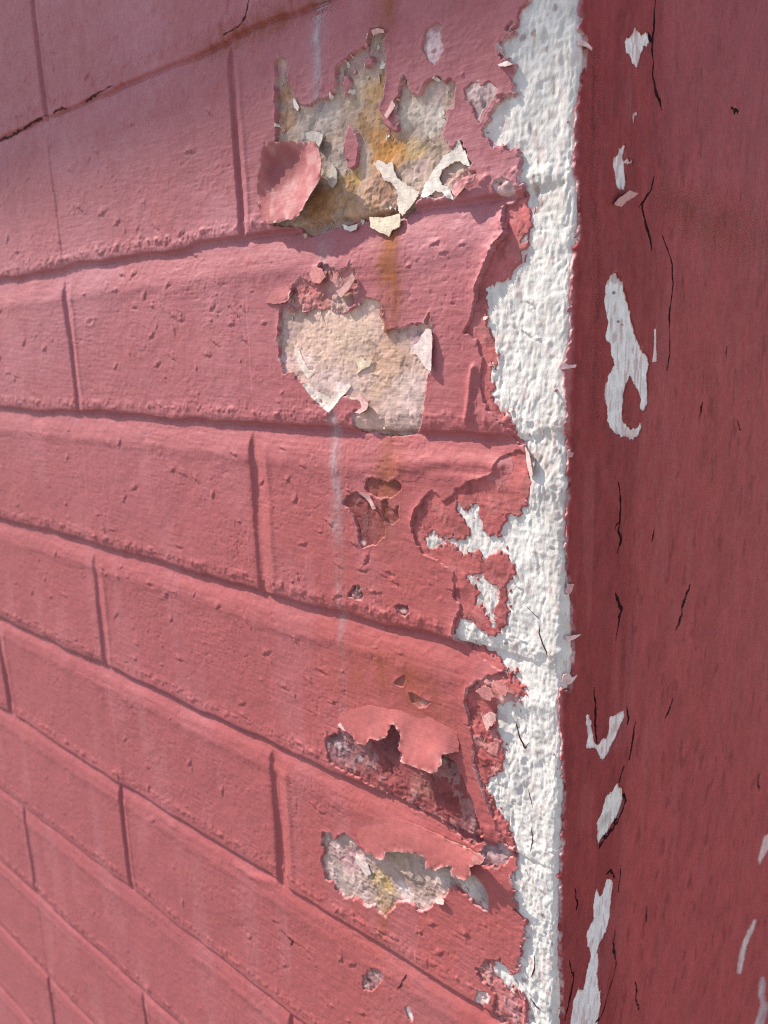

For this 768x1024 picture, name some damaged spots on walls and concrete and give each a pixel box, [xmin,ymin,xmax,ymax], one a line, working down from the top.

crack [223,0,249,35]
peeling [625,28,650,68]
crack [648,0,662,111]
crack [0,86,113,141]
peeling [613,145,638,207]
crack [639,176,674,369]
peeling [604,273,657,440]
peeling [257,0,613,1024]
crack [614,481,622,554]
peeling [586,711,624,760]
peeling [597,783,623,844]